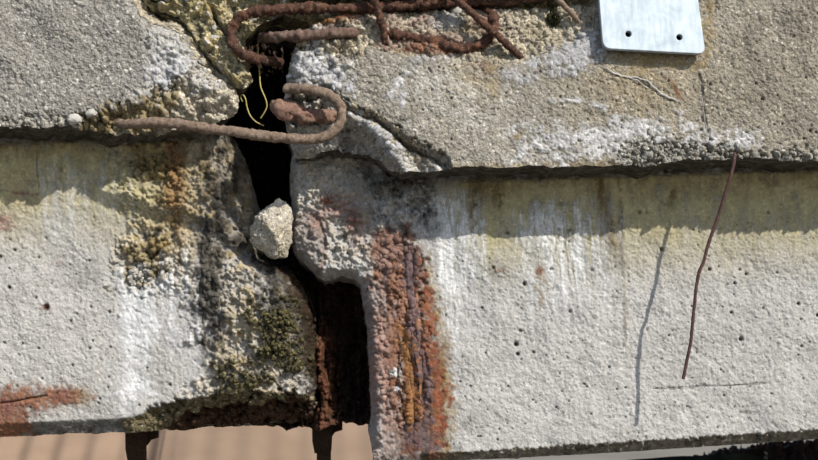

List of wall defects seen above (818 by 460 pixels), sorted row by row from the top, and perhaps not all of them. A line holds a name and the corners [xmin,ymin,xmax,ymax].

leakage [286,41,356,98]
spalling [285,92,451,174]
corrosion [406,35,453,53]
spalling [292,0,597,72]
crack [699,74,707,131]
leakage [184,136,248,347]
leakage [350,111,818,326]
efflorescence [119,260,176,406]
leakage [252,249,319,394]
corrosion [0,384,95,437]
spalling [123,389,321,434]
corrosion [315,323,340,431]